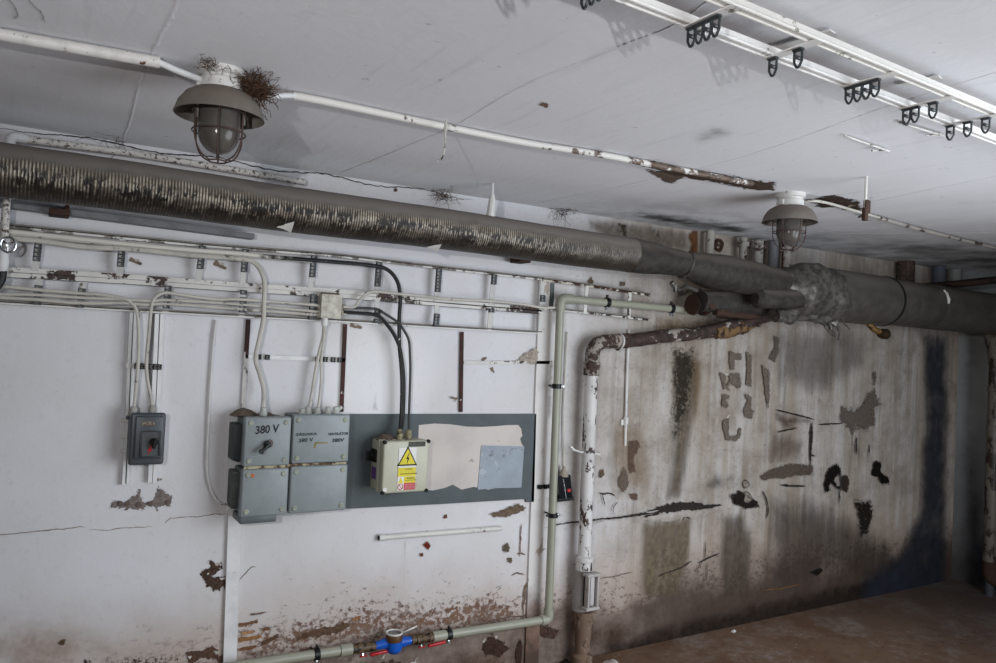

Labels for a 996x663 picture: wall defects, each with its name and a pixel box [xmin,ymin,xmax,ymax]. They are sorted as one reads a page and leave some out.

peeling [720,336,779,442]
crack [0,513,223,535]
spalling [111,478,172,512]
peeling [490,503,526,517]
leakage [590,337,947,654]
crack [488,492,722,622]
spalling [200,560,226,593]
spalling [186,646,223,663]
spalling [482,633,523,663]